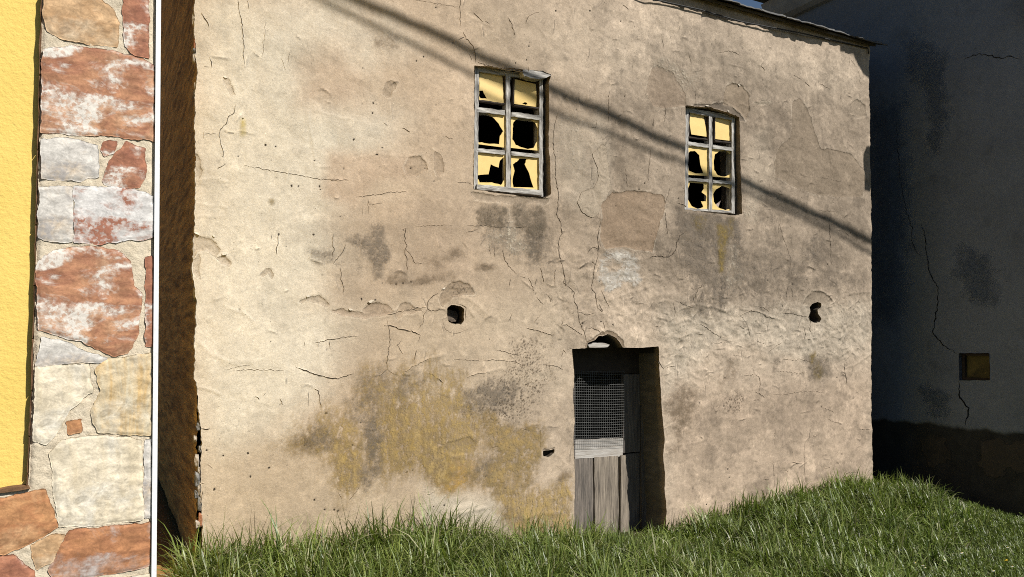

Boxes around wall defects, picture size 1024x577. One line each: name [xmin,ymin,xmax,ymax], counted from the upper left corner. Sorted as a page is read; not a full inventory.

crack [203,0,406,216]
damp [349,224,439,284]
crack [403,113,609,377]
damp [477,205,547,260]
flaking render [600,190,666,252]
crack [225,293,467,407]
flaking render [299,295,421,319]
damp [307,377,450,491]
damp [466,339,551,425]
crack [958,383,969,424]